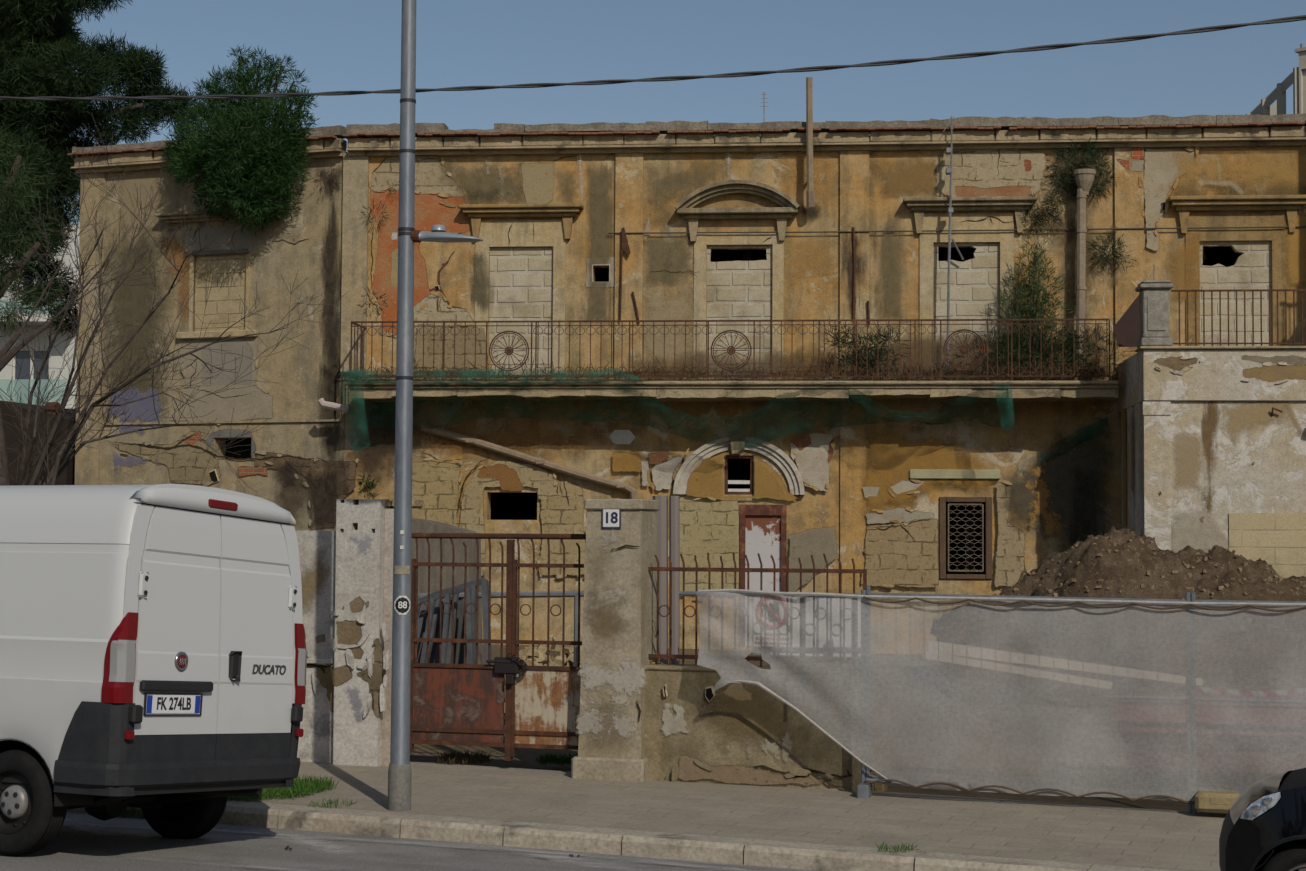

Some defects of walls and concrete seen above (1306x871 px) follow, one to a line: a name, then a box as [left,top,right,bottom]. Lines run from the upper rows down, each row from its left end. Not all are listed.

leakage [521,163,555,204]
peeling [936,148,1055,197]
peeling [1117,147,1199,251]
peeling [367,156,492,373]
crack [429,251,466,311]
leakage [471,254,488,308]
leakage [577,154,613,320]
leakage [320,169,395,478]
peeling [1241,355,1306,384]
leakage [413,421,607,453]
peeling [790,429,835,491]
peeling [307,597,390,718]